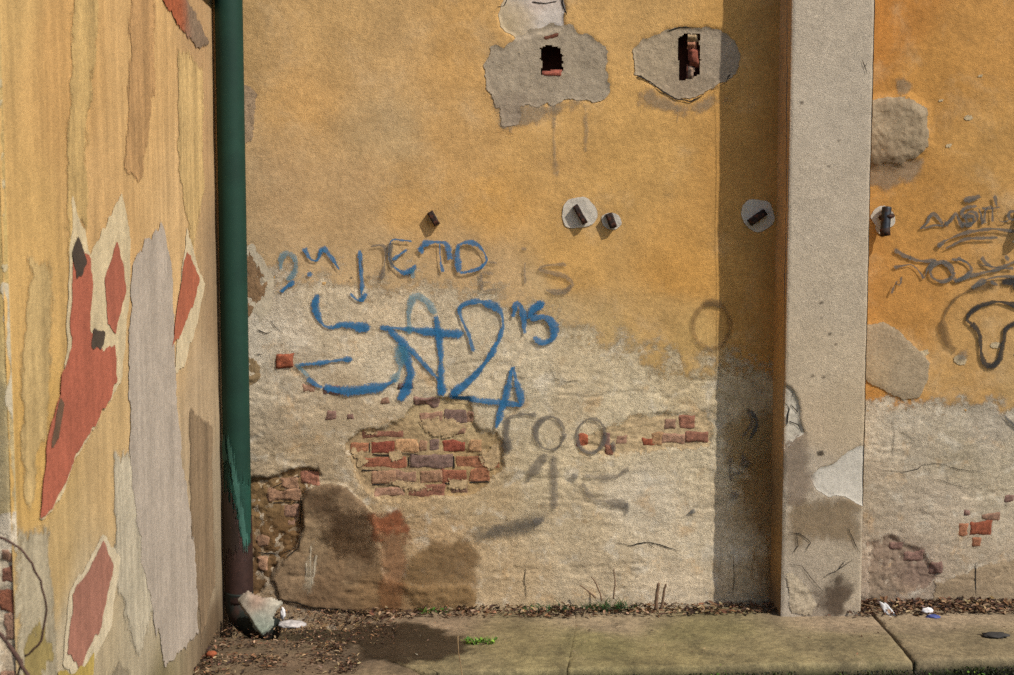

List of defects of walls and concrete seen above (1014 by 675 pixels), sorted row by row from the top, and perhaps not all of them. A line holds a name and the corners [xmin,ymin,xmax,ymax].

spalling [497,0,567,38]
spalling [540,45,563,75]
spalling [678,34,701,80]
peeling [0,256,55,507]
peeling [0,511,58,675]
peeling [114,450,153,656]
peeling [189,408,216,645]
water stain [305,546,317,588]
water stain [306,491,378,560]
peeling [247,244,804,632]
peeling [810,395,1014,608]